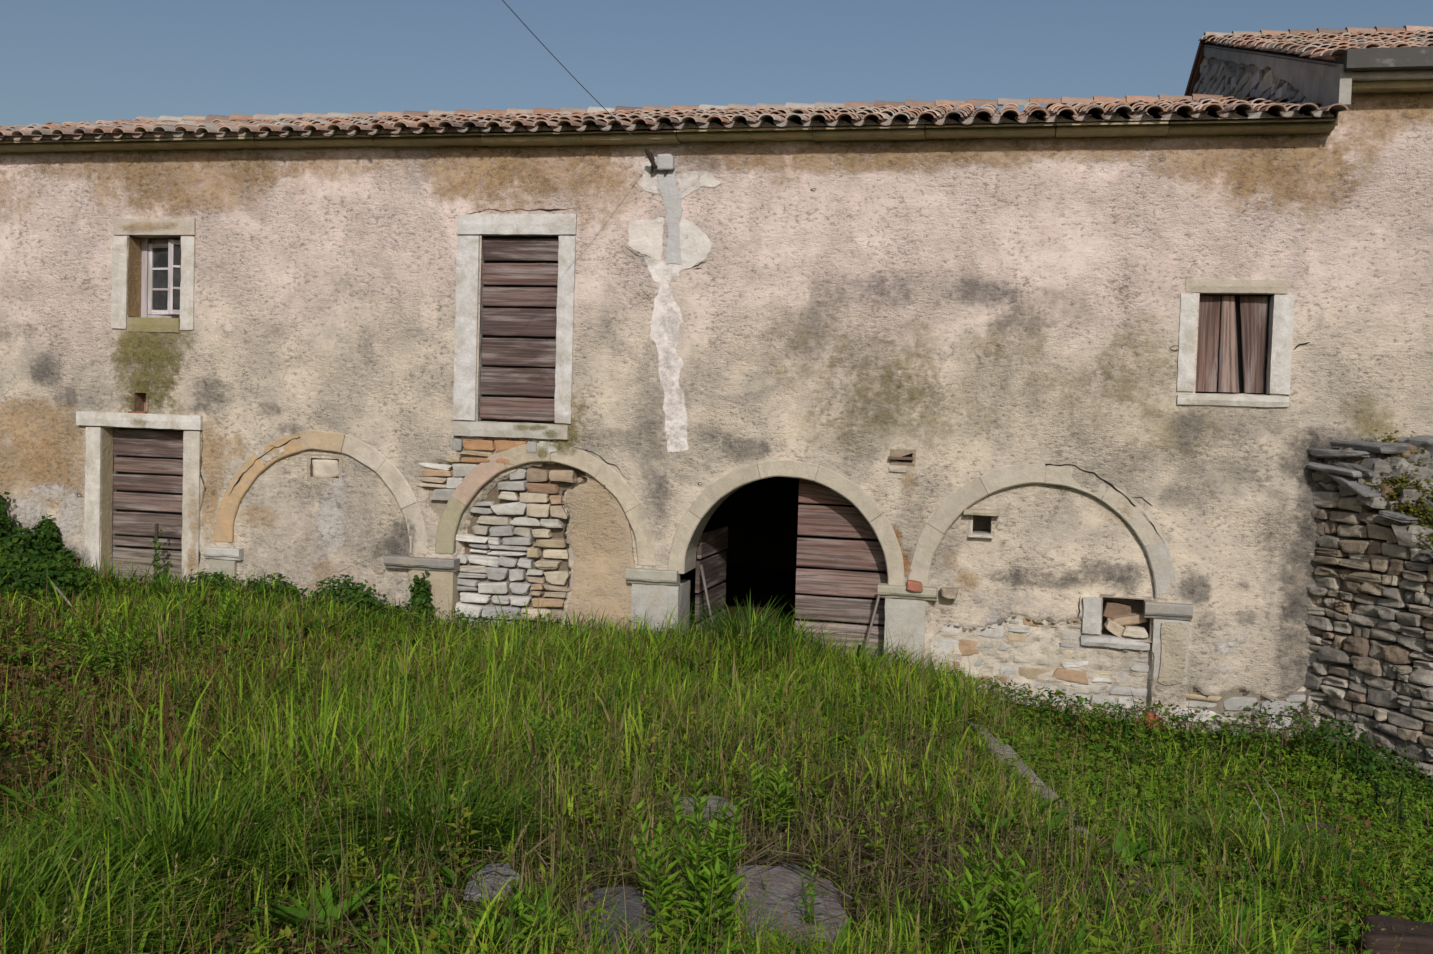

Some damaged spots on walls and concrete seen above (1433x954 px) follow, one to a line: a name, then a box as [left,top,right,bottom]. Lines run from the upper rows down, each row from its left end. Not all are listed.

peeling [628,160,721,453]
leakage [112,330,190,423]
crack [1029,463,1164,543]
spalling [930,614,1321,740]